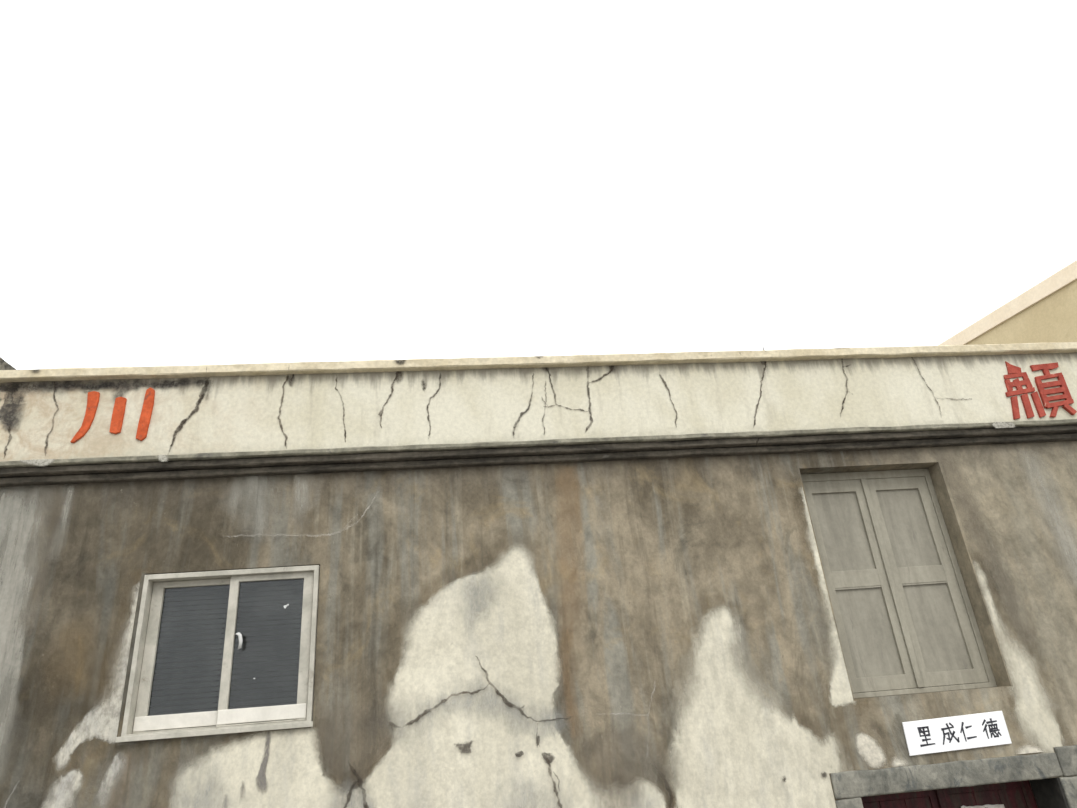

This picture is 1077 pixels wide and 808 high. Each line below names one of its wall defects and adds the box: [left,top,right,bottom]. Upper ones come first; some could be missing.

leakage [0,369,210,429]
crack [170,369,210,448]
crack [278,374,294,446]
crack [378,371,399,428]
crack [427,373,441,439]
crack [513,365,613,435]
crack [660,375,677,427]
crack [754,347,766,443]
leakage [0,493,39,685]
leakage [257,732,270,790]
crack [344,764,369,808]
crack [390,656,570,808]